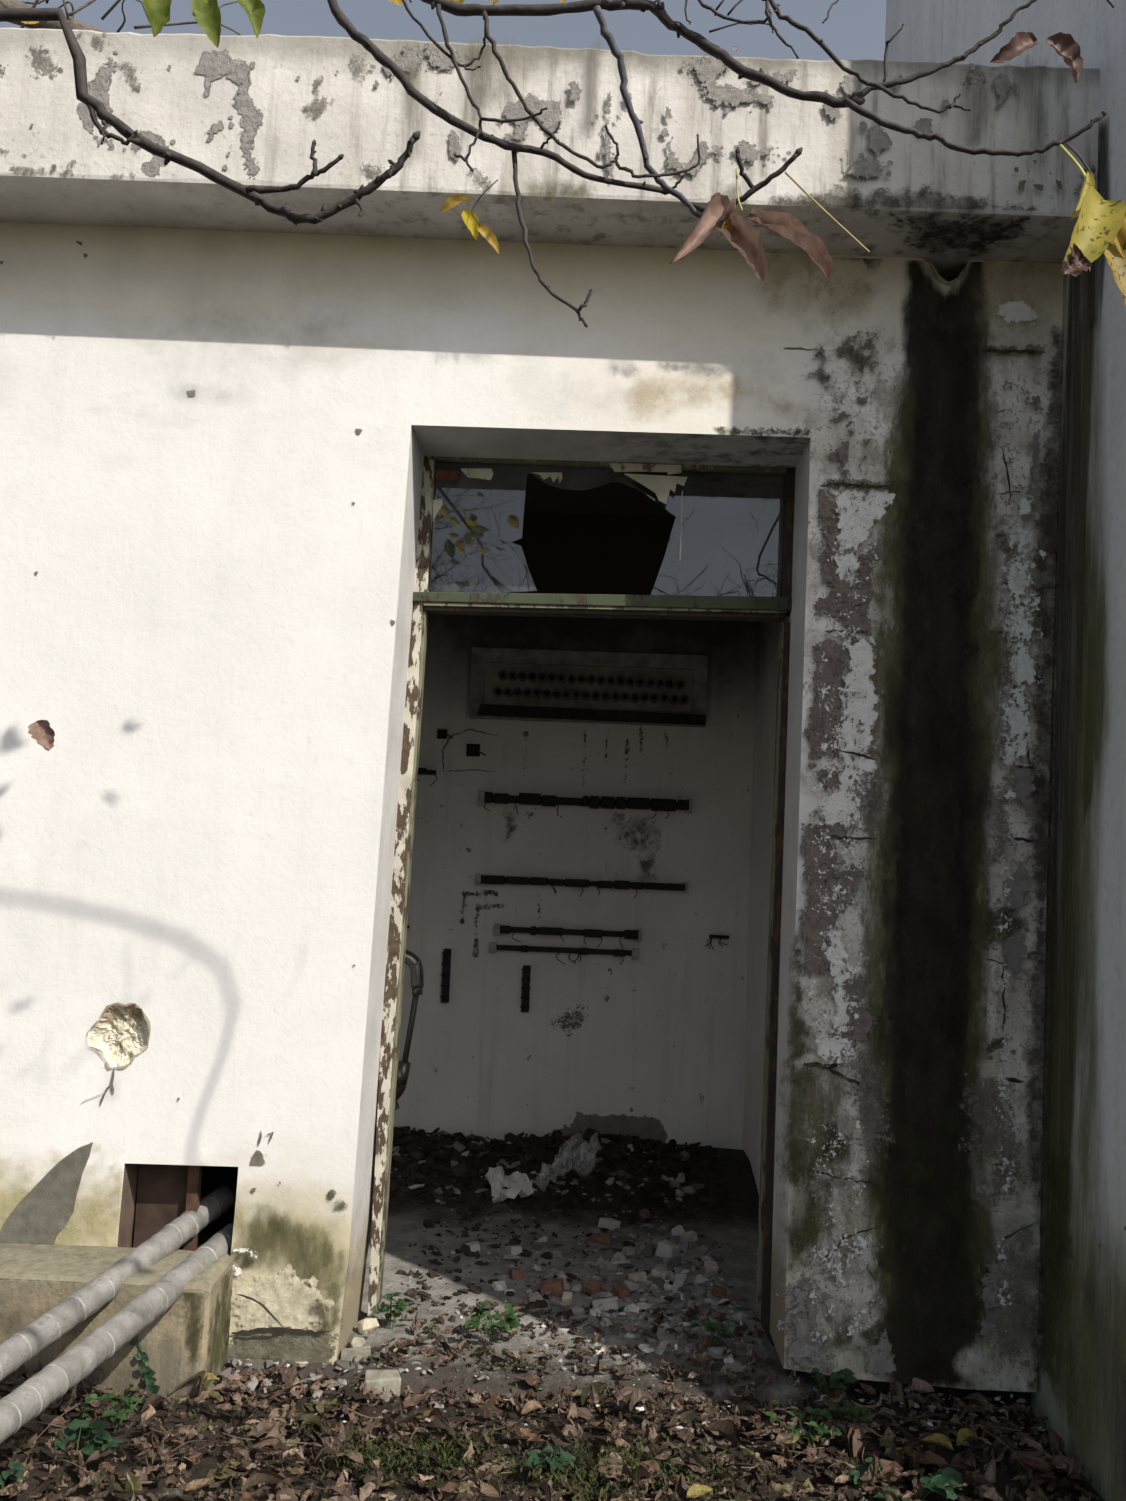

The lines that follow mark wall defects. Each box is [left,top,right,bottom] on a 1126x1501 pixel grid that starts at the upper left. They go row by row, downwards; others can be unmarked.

peeling [77,29,176,177]
peeling [193,49,264,180]
peeling [296,43,473,119]
damp [410,66,421,109]
peeling [501,81,582,144]
damp [587,46,598,127]
peeling [681,46,799,114]
damp [1074,122,1109,200]
peeling [804,380,884,791]
damp [769,184,1104,1424]
peeling [797,823,878,1047]
damp [327,1190,347,1211]